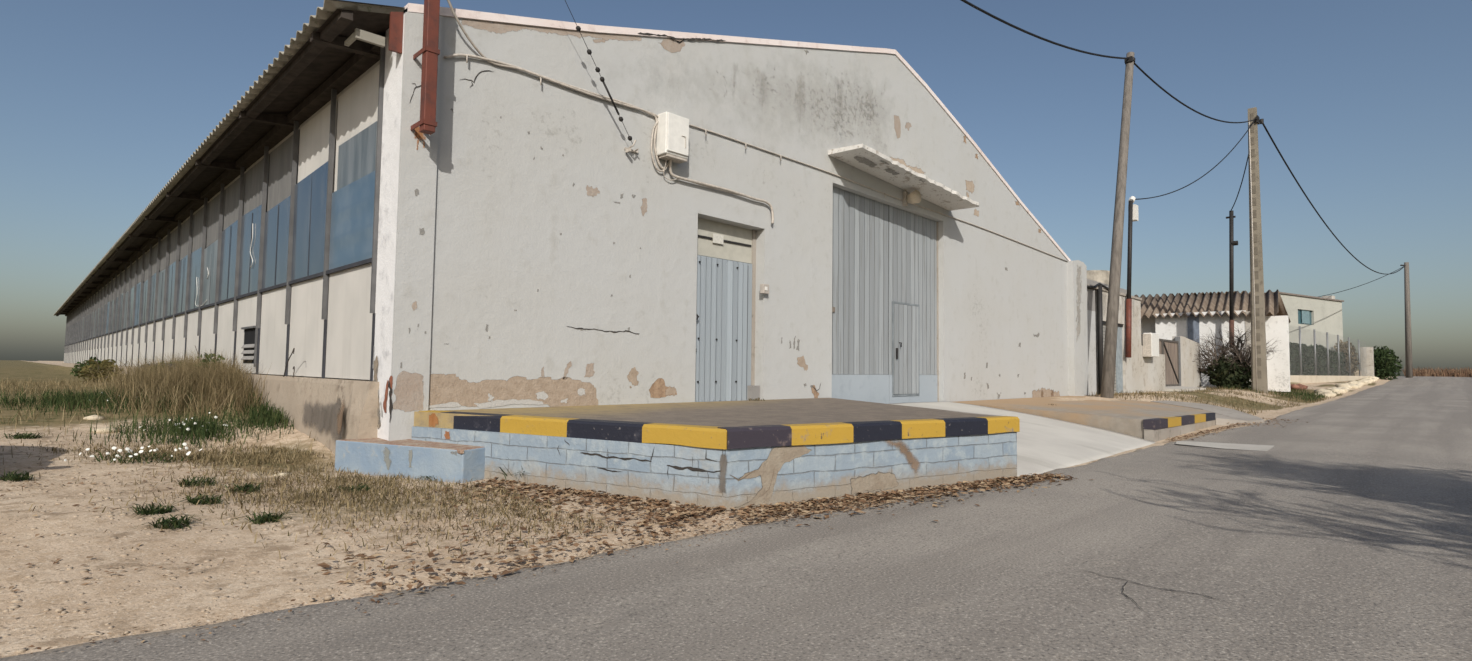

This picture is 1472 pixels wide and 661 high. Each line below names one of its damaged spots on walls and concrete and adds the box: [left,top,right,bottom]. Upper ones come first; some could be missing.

peeling [462,19,641,43]
peeling [660,39,685,53]
crack [567,326,639,335]
peeling [373,354,598,429]